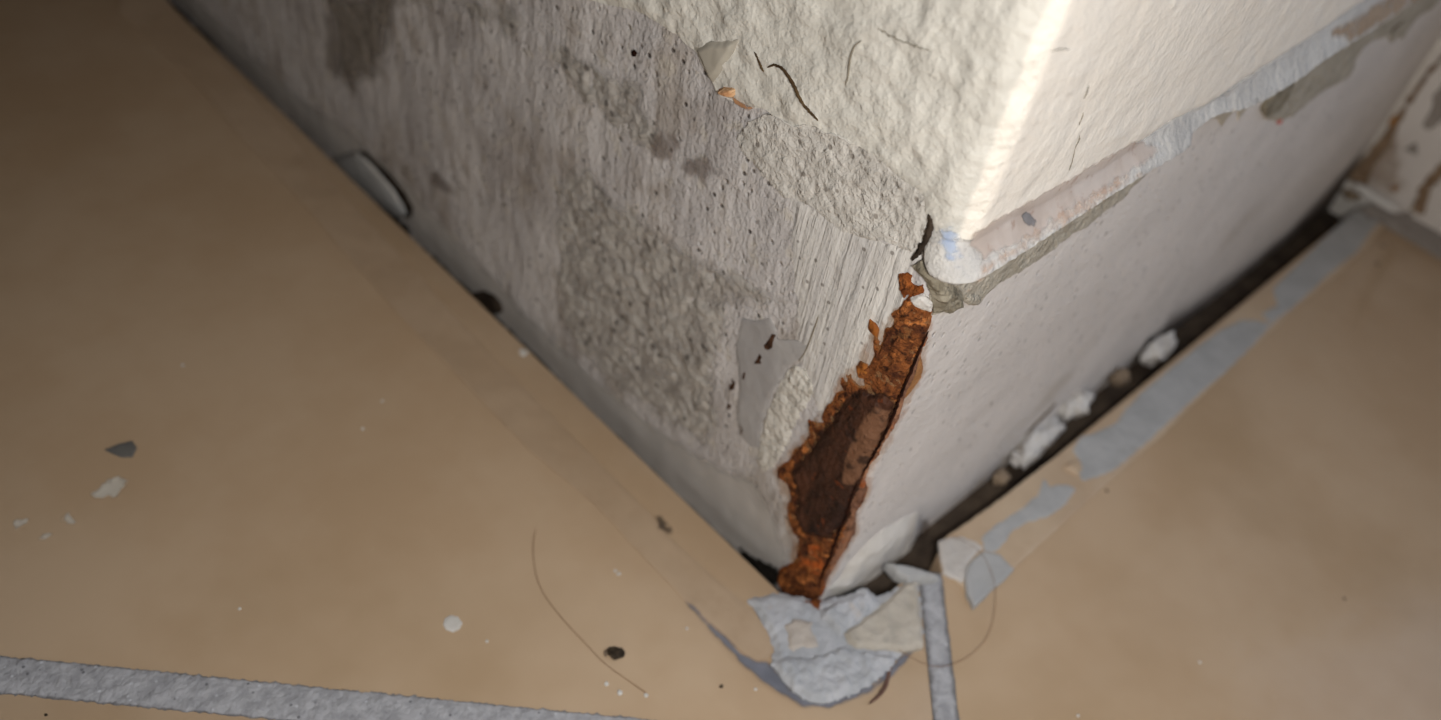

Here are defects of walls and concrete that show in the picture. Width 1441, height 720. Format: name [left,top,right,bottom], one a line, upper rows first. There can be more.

crack [754,52,818,121]
crack [845,28,931,86]
spalling [1215,0,1440,126]
spalling [559,172,765,438]
spalling [910,289,946,315]
spalling [954,173,1147,306]
peeling [736,315,819,472]
rust [777,272,933,610]